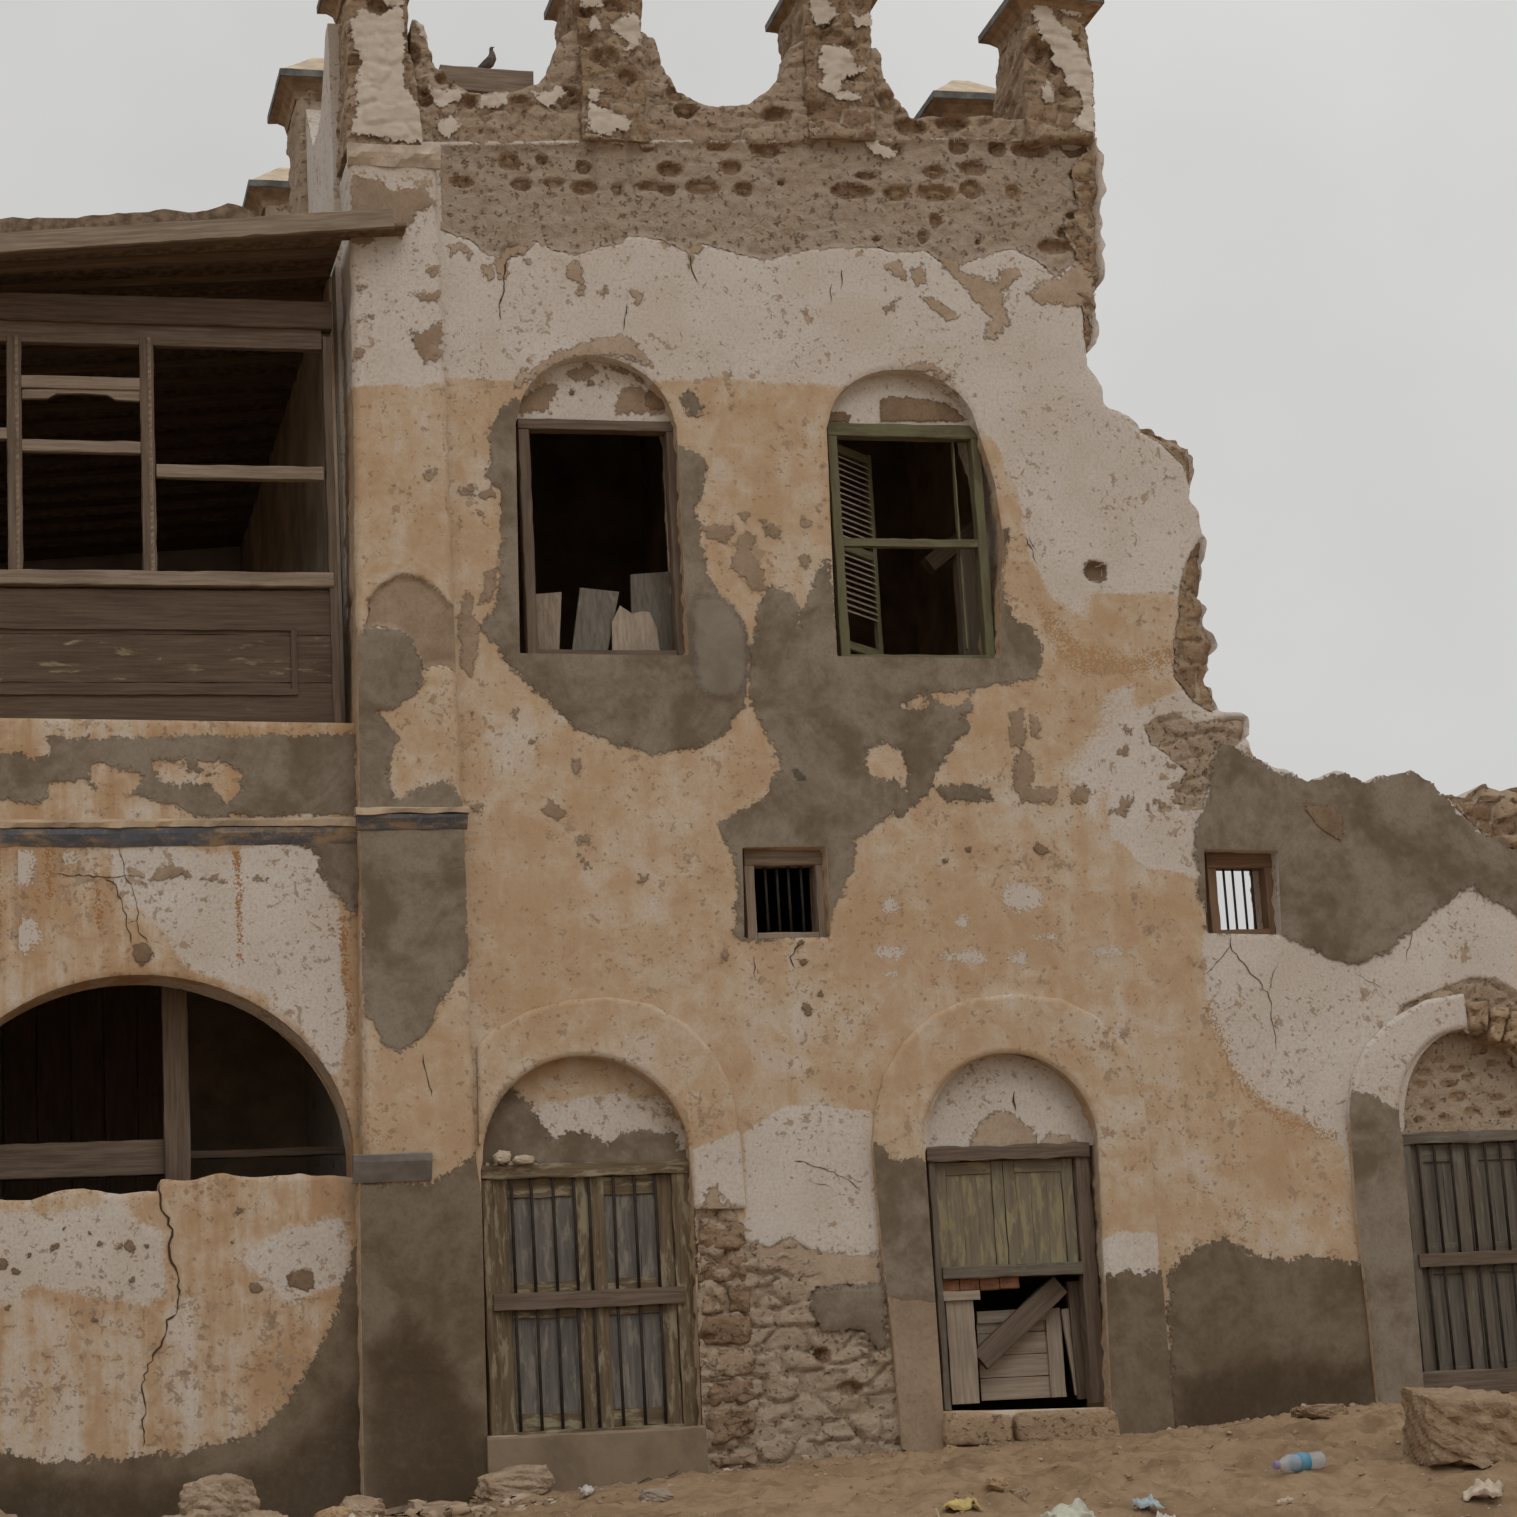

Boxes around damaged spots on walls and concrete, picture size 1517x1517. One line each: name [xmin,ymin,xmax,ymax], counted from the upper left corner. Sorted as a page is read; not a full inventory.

flaking render [349,0,1098,365]
peeling [457,484,496,524]
flaking render [1140,432,1190,488]
flaking render [363,567,498,678]
flaking render [1449,788,1517,850]
crack [55,850,148,943]
flaking render [1396,976,1517,1048]
crack [141,1185,181,1446]
flaking render [694,1183,946,1473]